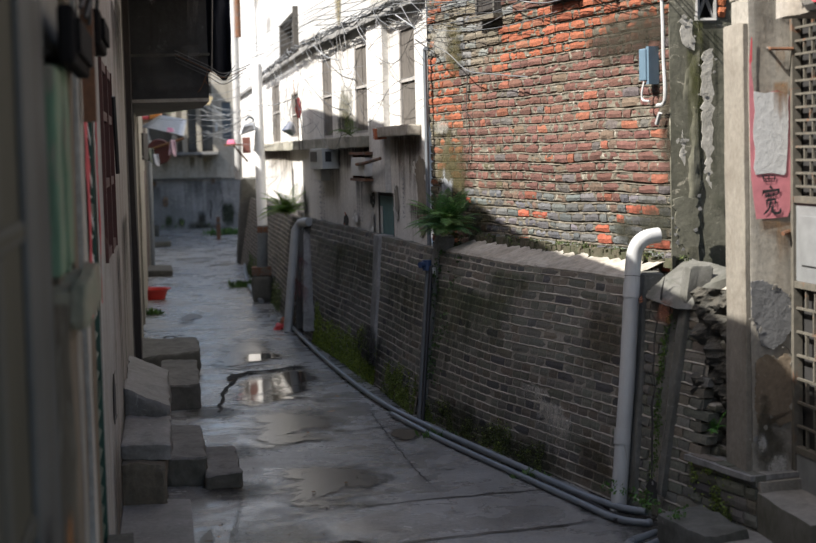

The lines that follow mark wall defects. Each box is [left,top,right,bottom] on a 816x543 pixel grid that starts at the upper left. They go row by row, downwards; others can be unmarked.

flaking render [676,131,689,166]
spalling [671,194,702,251]
flaking render [679,14,717,189]
spalling [689,287,727,457]
flaking render [749,280,792,431]